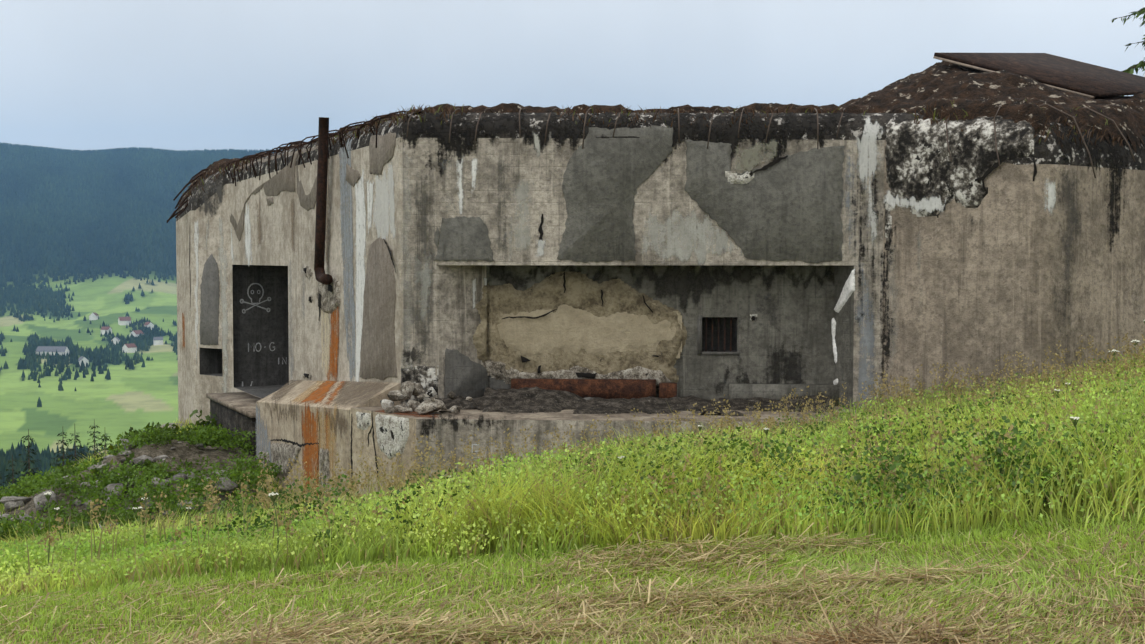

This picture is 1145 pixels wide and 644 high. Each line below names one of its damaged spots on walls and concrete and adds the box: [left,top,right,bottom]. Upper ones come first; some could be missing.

spalling [167,167,210,223]
peeling [225,108,423,241]
peeling [557,108,845,264]
damp [1045,173,1081,302]
damp [1045,122,1145,253]
crack [271,415,320,471]
rust [301,307,346,496]
crack [350,414,378,480]
peeling [356,238,511,459]
spalling [831,269,855,363]